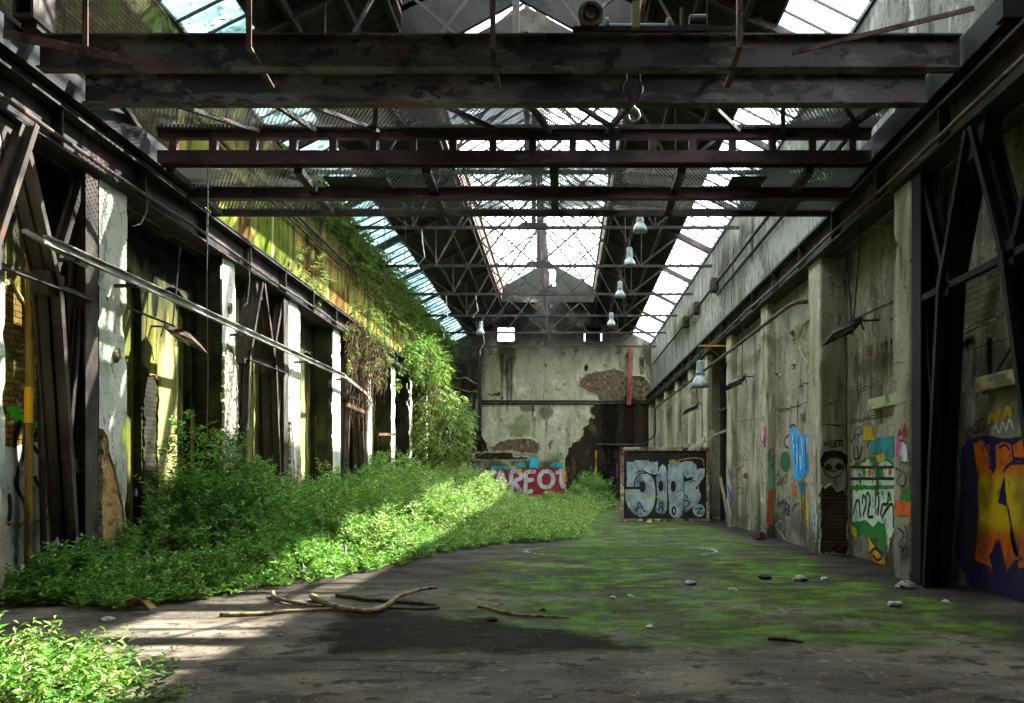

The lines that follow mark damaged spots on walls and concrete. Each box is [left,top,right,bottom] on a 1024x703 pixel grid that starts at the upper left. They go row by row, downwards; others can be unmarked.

flaking render [2,278,38,448]
flaking render [98,428,130,569]
flaking render [141,365,160,500]
flaking render [451,406,540,461]
water stain [497,342,554,438]
flaking render [562,364,651,502]
flaking render [817,483,849,555]